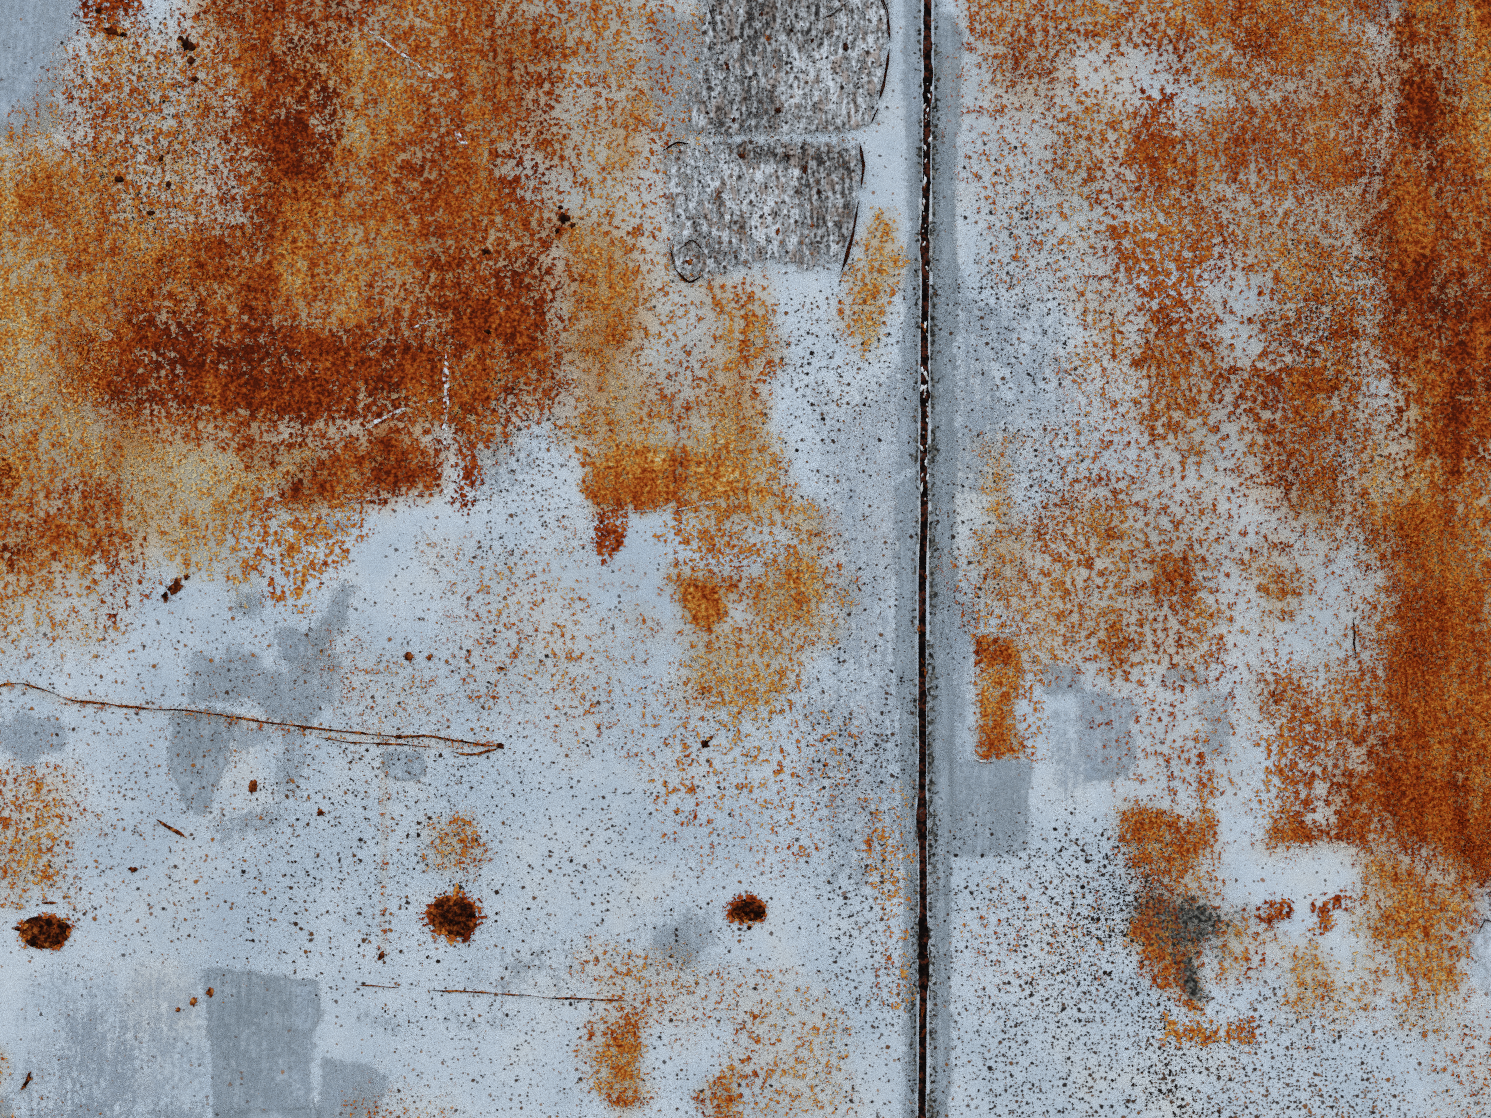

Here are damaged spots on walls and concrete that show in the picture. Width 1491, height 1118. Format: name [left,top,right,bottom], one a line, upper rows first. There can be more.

rust [341,1082,454,1118]
rust [0,0,926,1037]
rust [568,934,860,1118]
rust [924,0,1491,1118]